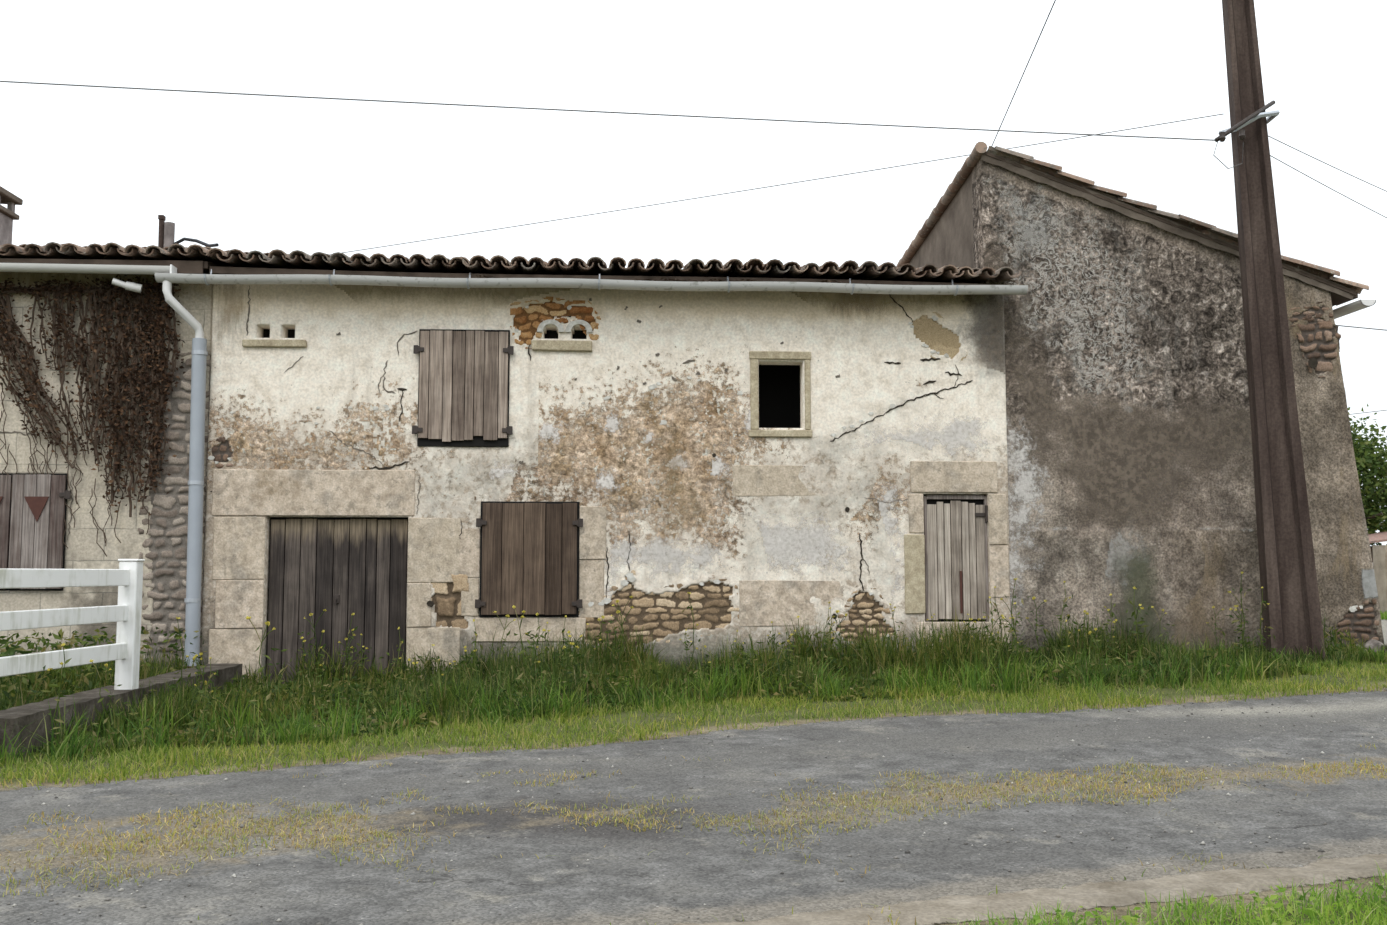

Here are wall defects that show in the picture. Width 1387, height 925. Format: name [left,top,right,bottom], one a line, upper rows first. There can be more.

spalling [510,296,601,361]
peeling [908,312,967,386]
crack [831,365,973,442]
peeling [489,346,790,586]
crack [859,533,870,591]